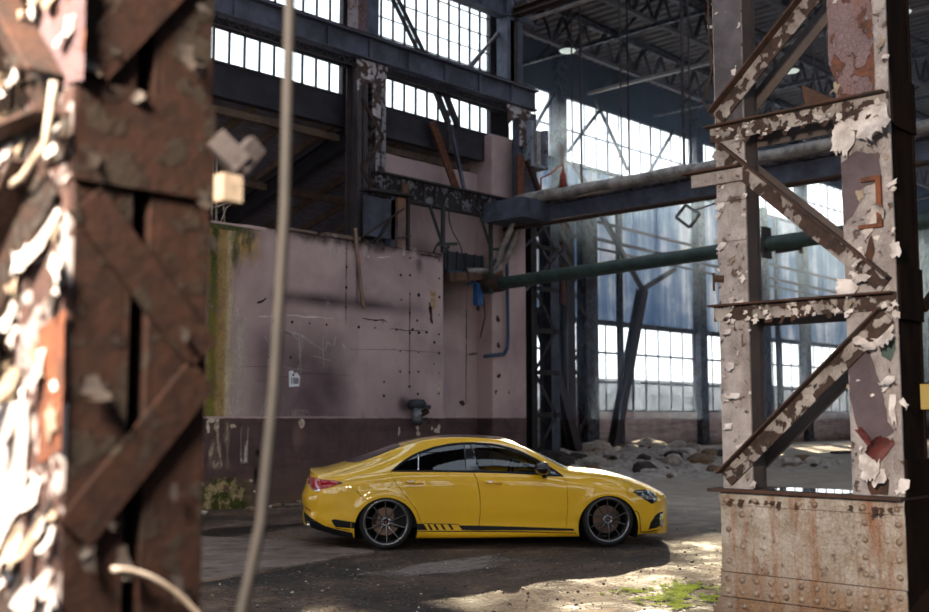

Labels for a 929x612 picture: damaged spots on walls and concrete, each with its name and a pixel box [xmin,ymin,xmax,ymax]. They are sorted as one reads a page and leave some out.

peeling [0,55,36,97]
peeling [17,0,52,27]
peeling [707,0,742,100]
corrosion [826,0,875,98]
peeling [0,137,26,176]
peeling [0,204,64,348]
peeling [776,98,897,318]
peeling [890,227,901,259]
water stain [205,222,257,468]
peeling [846,299,910,495]
peeling [0,340,57,612]
water stain [202,479,247,510]